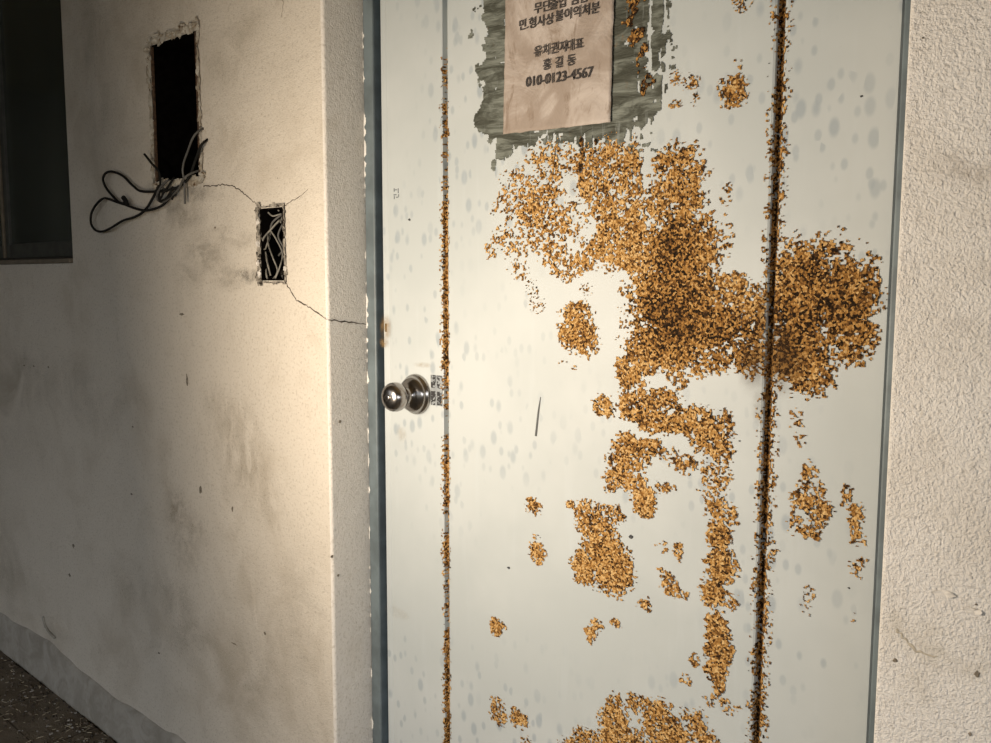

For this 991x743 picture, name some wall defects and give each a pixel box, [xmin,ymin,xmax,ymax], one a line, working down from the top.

crack [203,184,256,204]
crack [285,281,366,325]
rust [439,48,451,743]
rust [484,0,888,743]